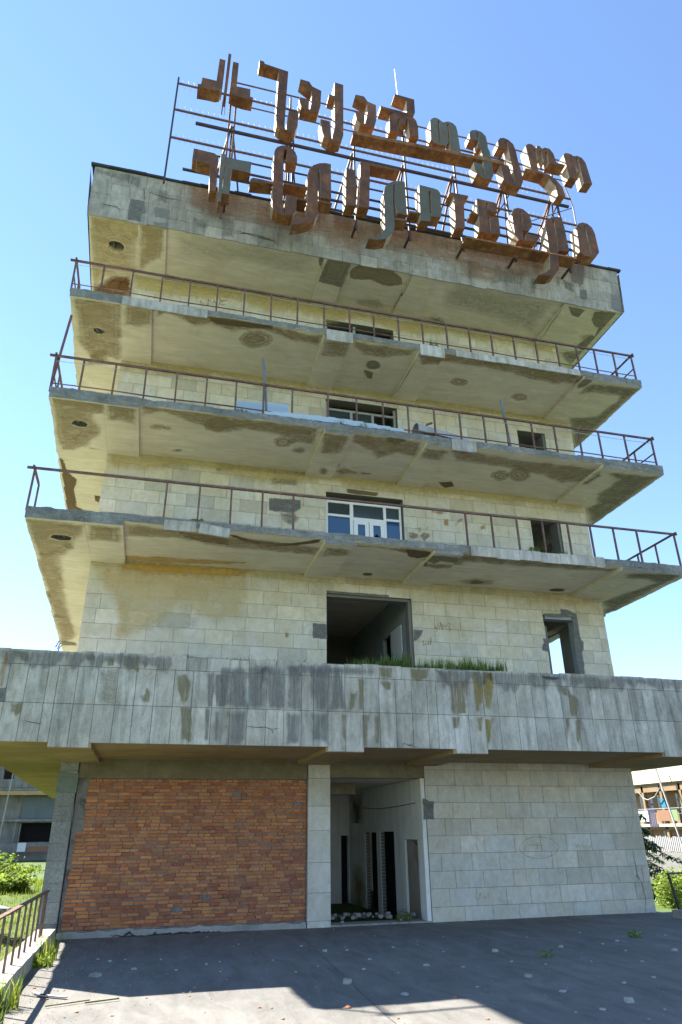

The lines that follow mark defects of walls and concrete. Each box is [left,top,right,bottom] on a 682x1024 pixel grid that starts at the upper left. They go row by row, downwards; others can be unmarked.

water stain [139,226,552,349]
water stain [76,300,636,441]
water stain [53,399,600,484]
peeling [60,459,82,510]
water stain [113,449,656,520]
water stain [28,520,79,639]
water stain [125,556,243,576]
water stain [91,527,346,555]
spalling [544,609,585,674]
water stain [206,666,392,744]
water stain [411,669,677,742]